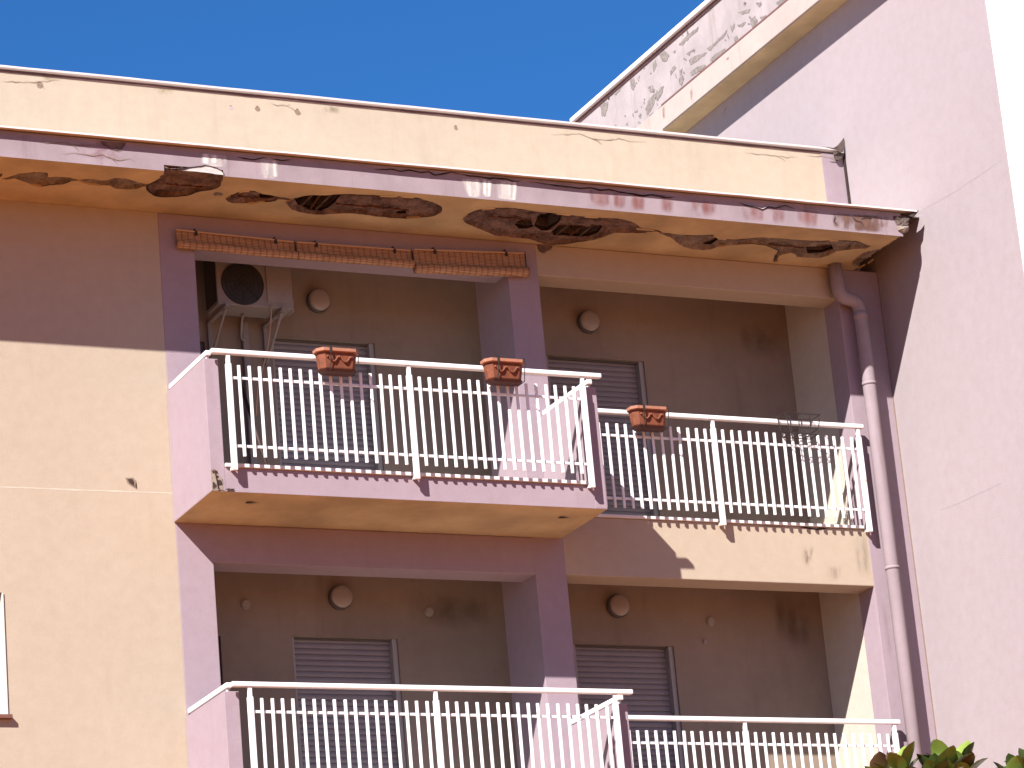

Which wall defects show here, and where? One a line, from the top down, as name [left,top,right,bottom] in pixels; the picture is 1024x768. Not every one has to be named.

peeling [599,2,766,127]
spalling [0,165,442,219]
spalling [462,208,911,269]
spalling [211,469,234,491]